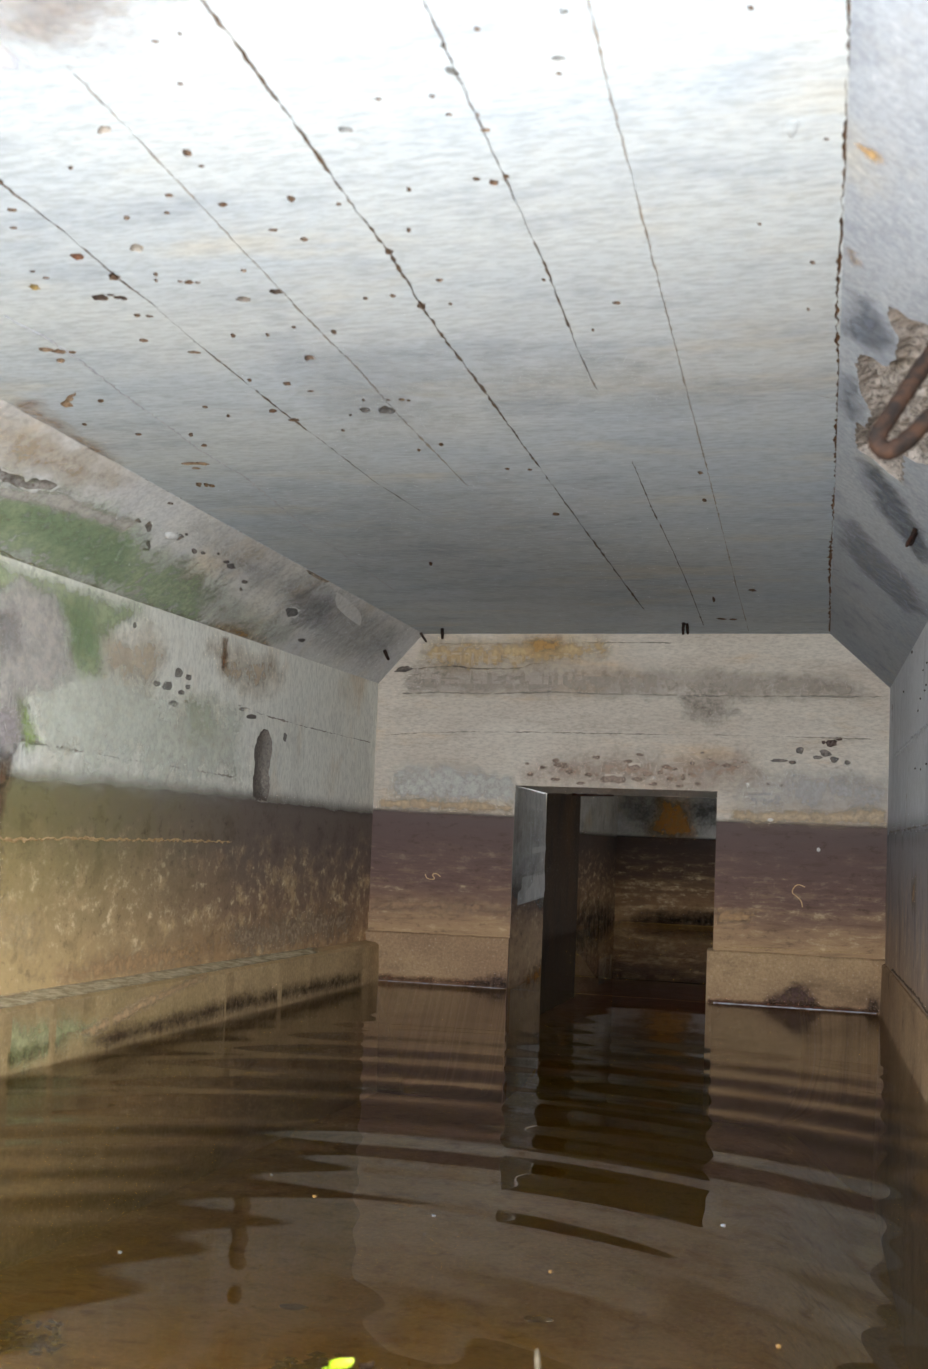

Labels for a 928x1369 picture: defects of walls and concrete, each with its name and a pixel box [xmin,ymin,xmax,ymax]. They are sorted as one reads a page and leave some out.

peeling [0,468,58,490]
leakage [0,488,134,530]
crack [0,65,467,513]
crack [201,0,644,609]
crack [826,0,851,631]
spalling [854,307,928,483]
leakage [0,577,544,1046]
leakage [577,779,928,1016]